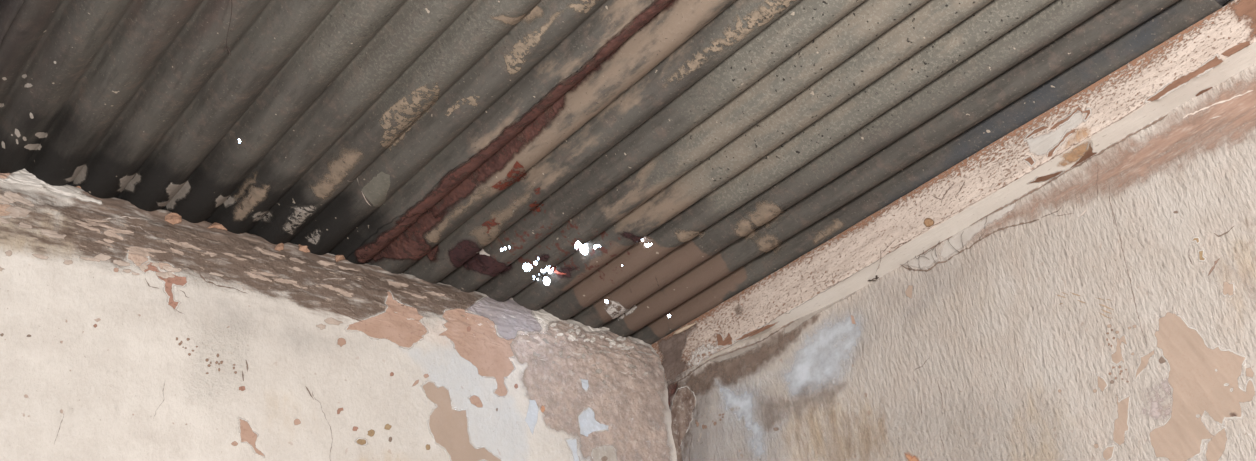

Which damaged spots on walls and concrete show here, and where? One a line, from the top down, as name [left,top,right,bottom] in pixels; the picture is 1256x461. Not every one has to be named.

peeling [666,0,796,86]
peeling [1145,0,1256,102]
peeling [0,165,102,239]
peeling [158,181,191,209]
peeling [216,174,272,221]
peeling [283,149,363,245]
rust [355,0,677,278]
flaking render [906,79,1256,267]
flaking render [63,219,360,313]
spalling [316,281,724,461]
leakage [679,318,860,455]
peeling [1093,312,1256,461]